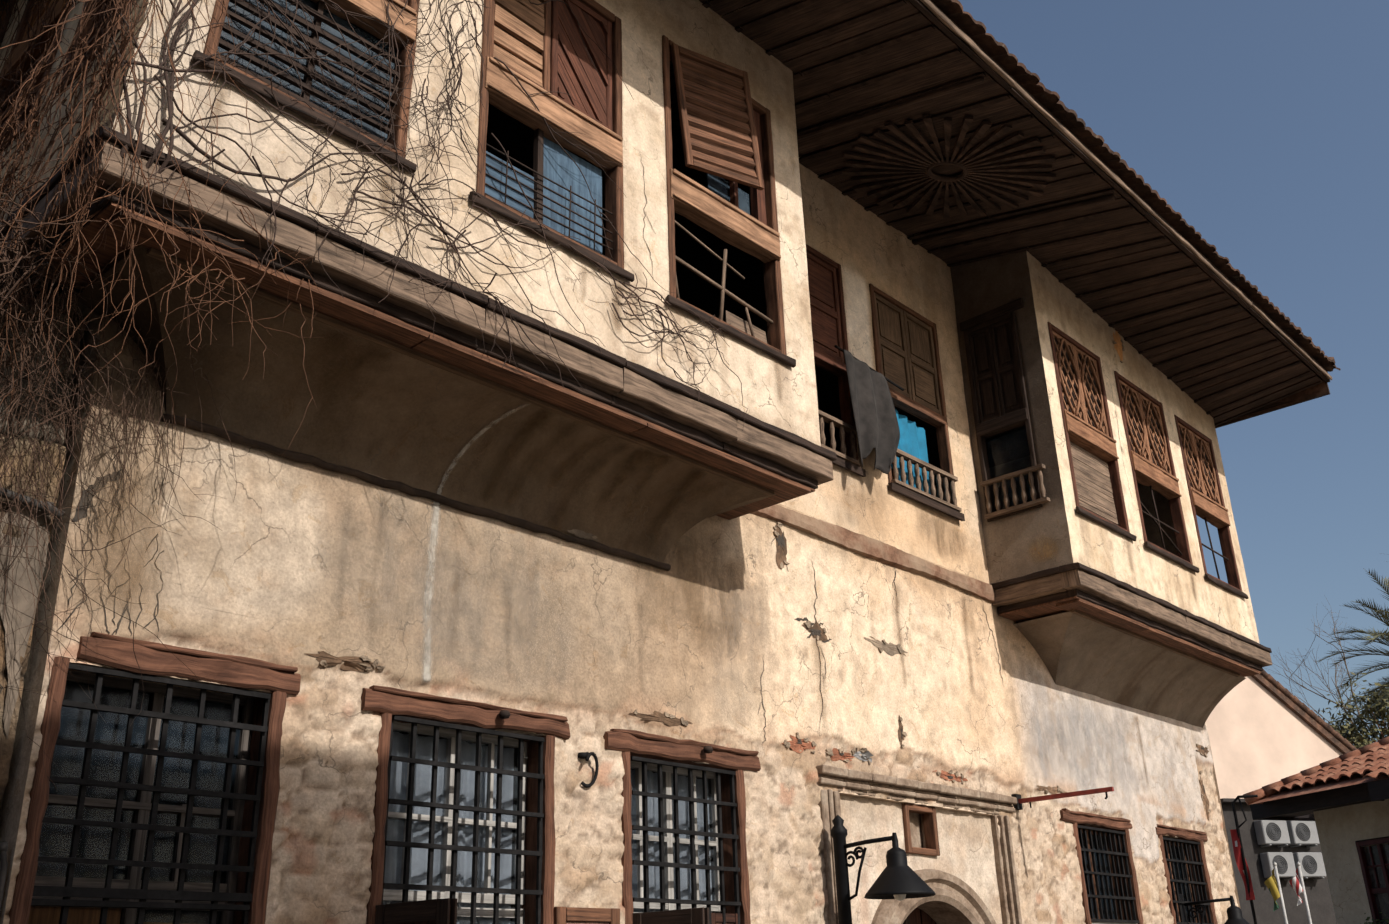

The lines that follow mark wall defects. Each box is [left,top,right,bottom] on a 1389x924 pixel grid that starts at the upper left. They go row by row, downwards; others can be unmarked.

flaking render [803,621,828,641]
flaking render [864,636,908,657]
flaking render [304,651,385,672]
flaking render [629,709,693,726]
flaking render [781,732,874,765]